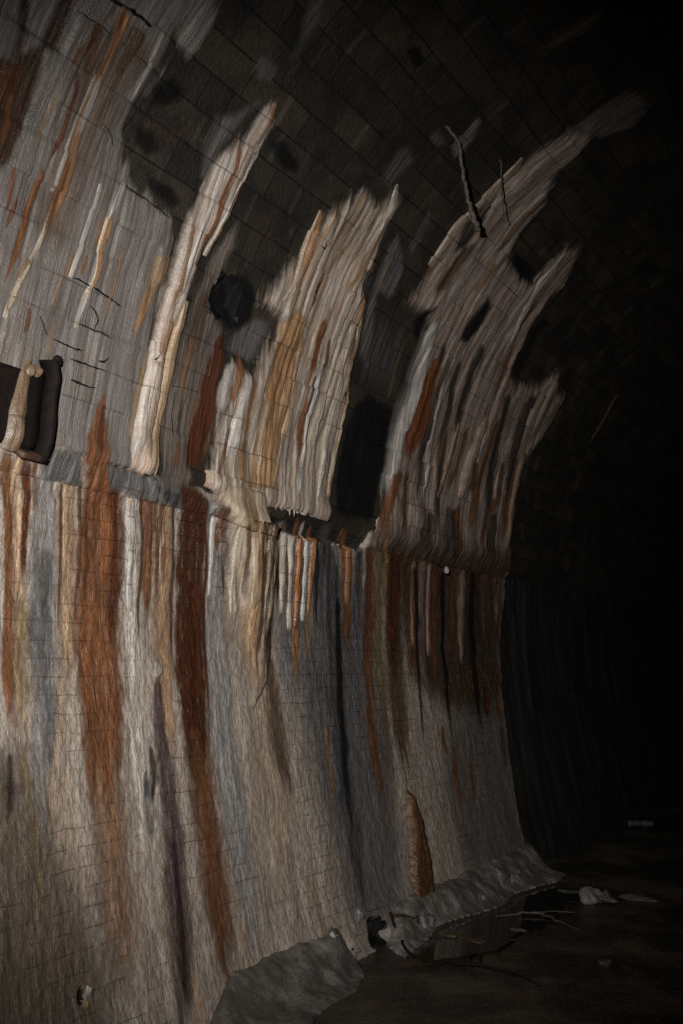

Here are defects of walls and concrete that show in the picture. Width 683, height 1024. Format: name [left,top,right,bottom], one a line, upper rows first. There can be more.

corrosion [74,396,133,976]